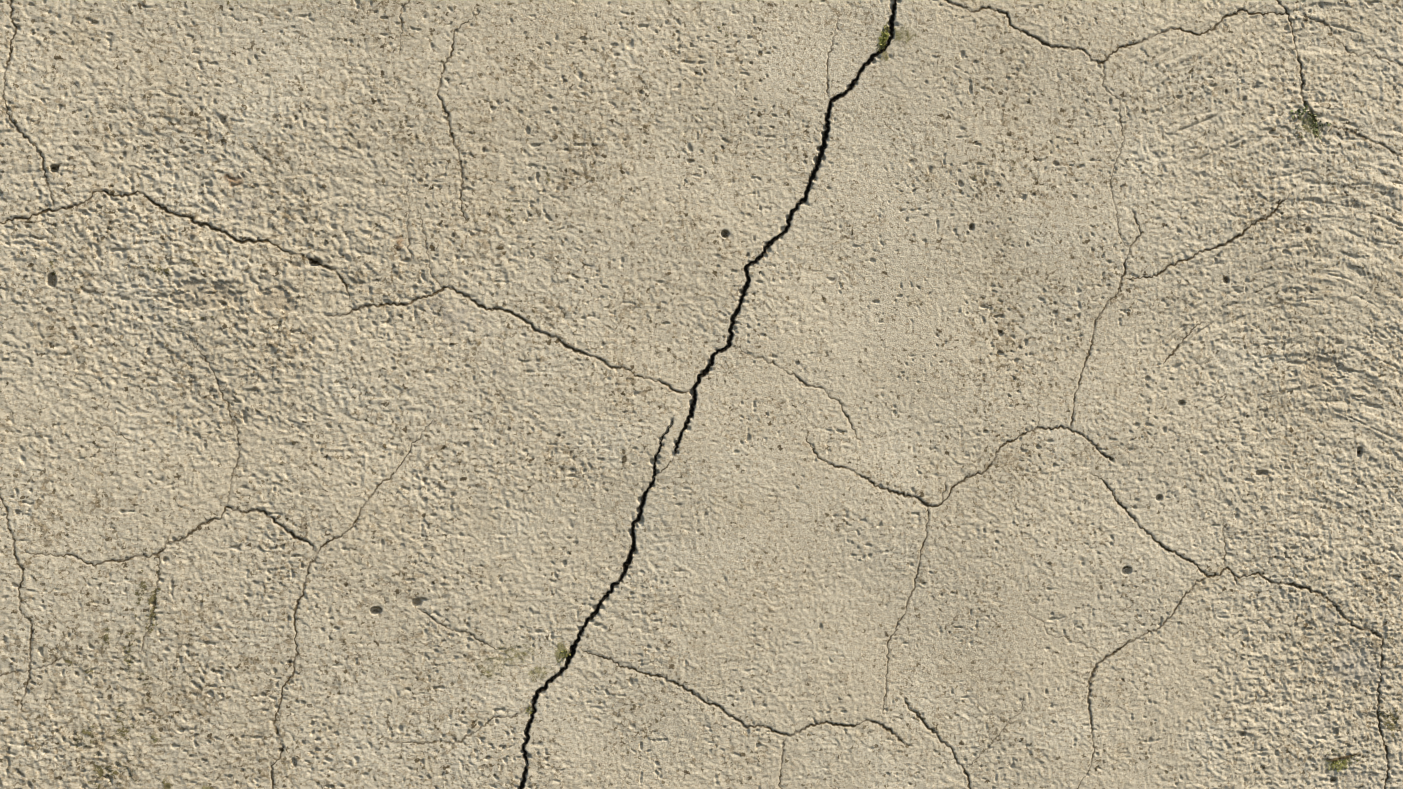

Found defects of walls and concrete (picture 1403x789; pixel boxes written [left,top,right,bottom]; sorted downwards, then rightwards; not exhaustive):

crack [944,0,1403,195]
crack [0,0,909,789]
crack [806,199,1286,710]
crack [905,701,973,789]
crack [1077,474,1389,789]